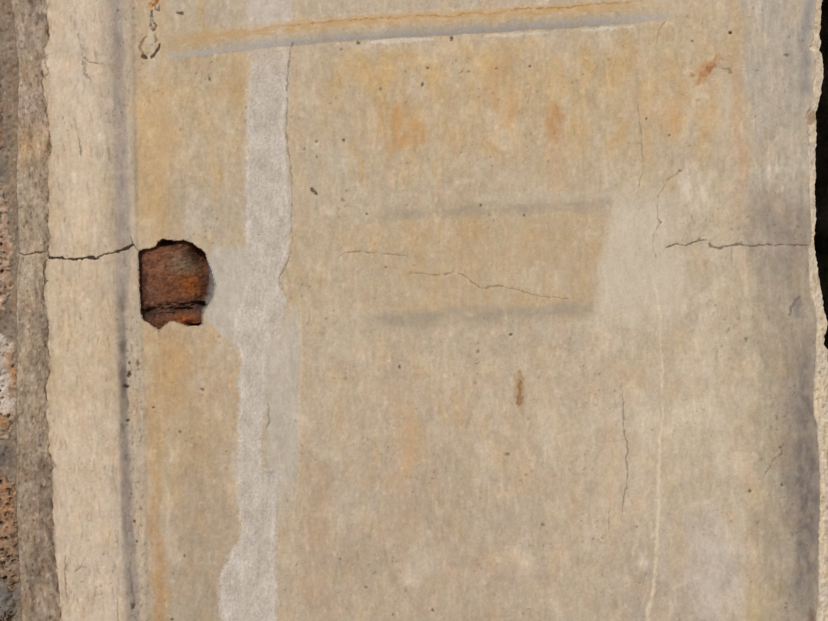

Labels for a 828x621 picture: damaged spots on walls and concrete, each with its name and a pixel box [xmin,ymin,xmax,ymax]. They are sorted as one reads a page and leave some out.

corrosion [135,0,169,30]
corrosion [694,53,733,86]
crack [634,39,809,271]
crack [19,234,140,286]
crack [338,249,573,300]
corrosion [513,364,527,415]